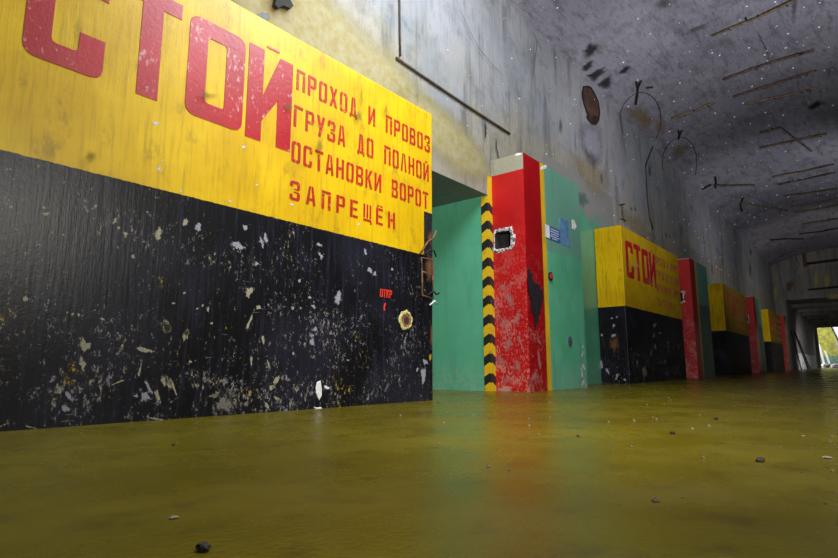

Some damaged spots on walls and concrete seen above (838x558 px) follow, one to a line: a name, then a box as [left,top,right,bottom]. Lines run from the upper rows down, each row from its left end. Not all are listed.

peeling [497,281,524,373]
peeling [78,337,91,371]
peeling [134,363,177,403]
peeling [209,377,235,416]
peeling [314,381,330,409]